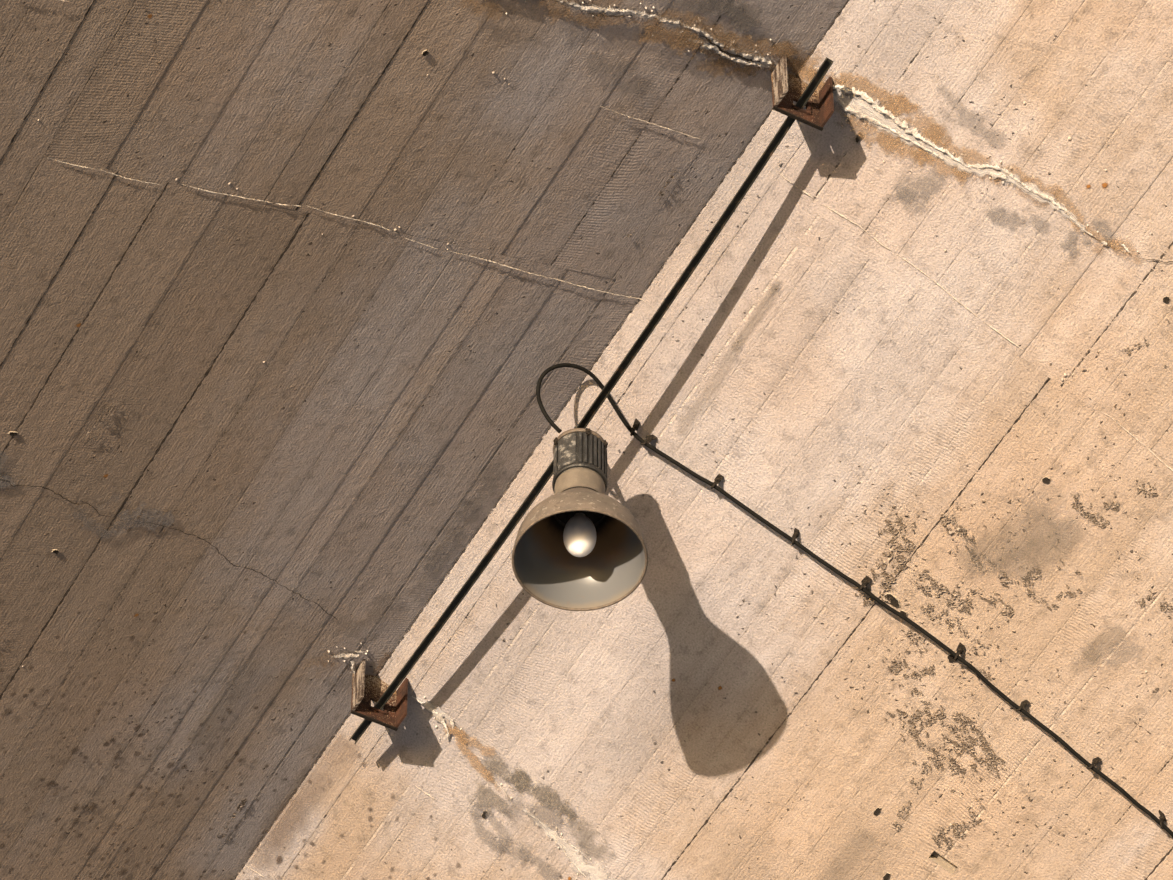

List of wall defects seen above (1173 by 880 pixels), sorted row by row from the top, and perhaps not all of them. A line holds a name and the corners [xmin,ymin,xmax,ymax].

crack [506,0,772,69]
crack [0,479,111,517]
crack [143,522,340,624]
damp [412,696,462,740]
damp [474,756,612,880]